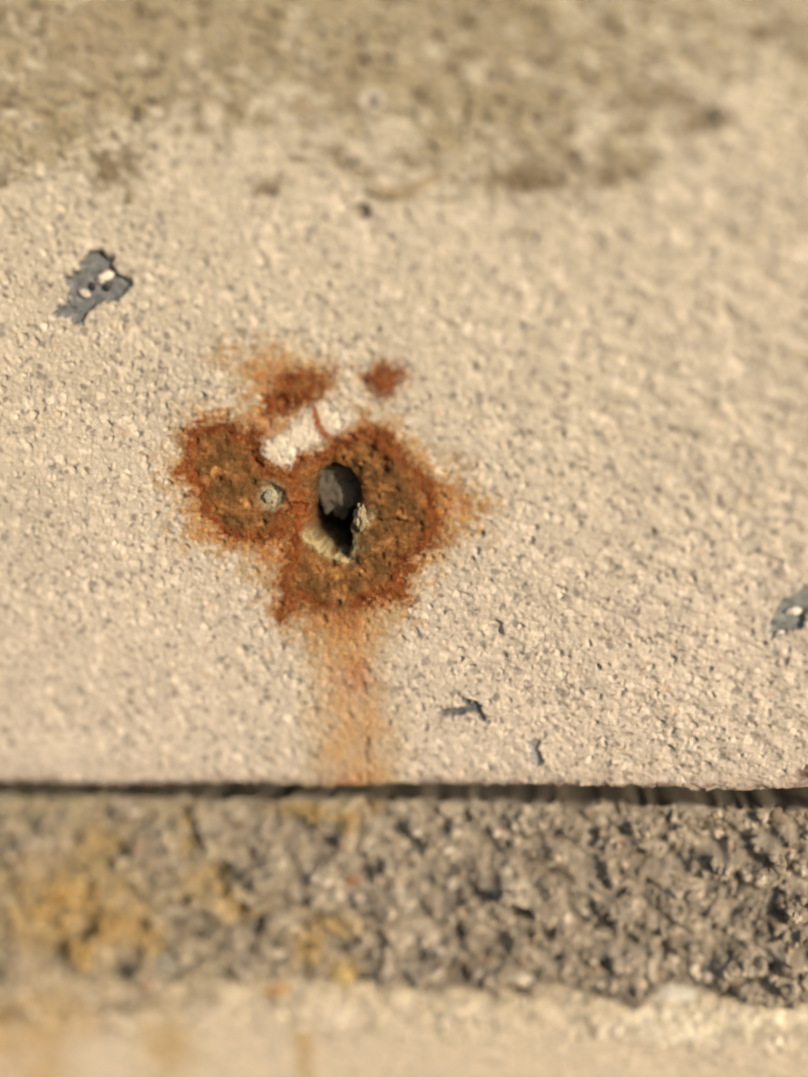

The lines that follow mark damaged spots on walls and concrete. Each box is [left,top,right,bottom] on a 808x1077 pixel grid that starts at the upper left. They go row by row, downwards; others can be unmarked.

peeling [54,251,133,325]
corrosion [169,344,491,786]
peeling [769,585,808,637]